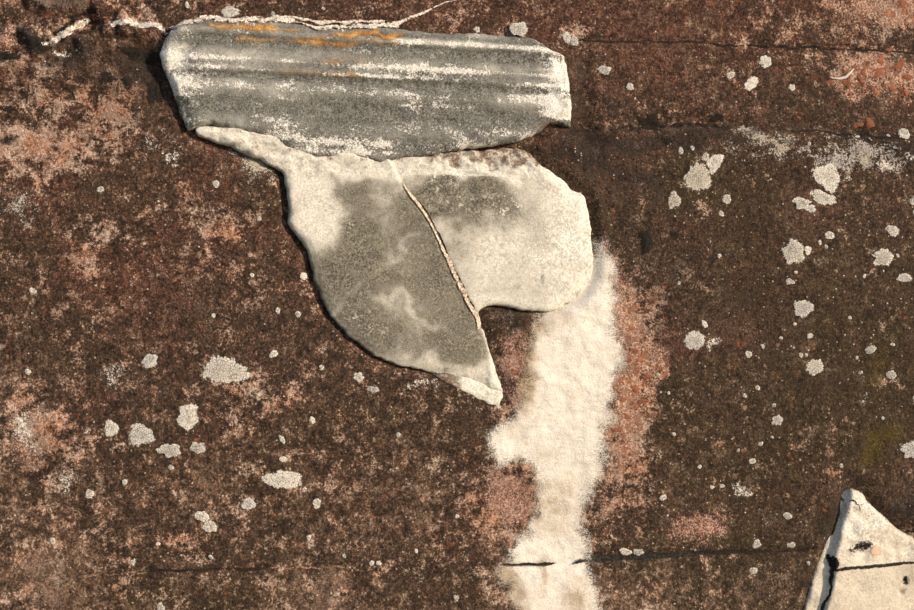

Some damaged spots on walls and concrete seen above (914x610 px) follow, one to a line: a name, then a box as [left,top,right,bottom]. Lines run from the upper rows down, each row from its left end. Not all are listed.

crack [3,7,98,60]
corrosion [210,23,402,46]
crack [404,184,481,329]
water stain [487,240,627,610]
crack [502,545,914,610]